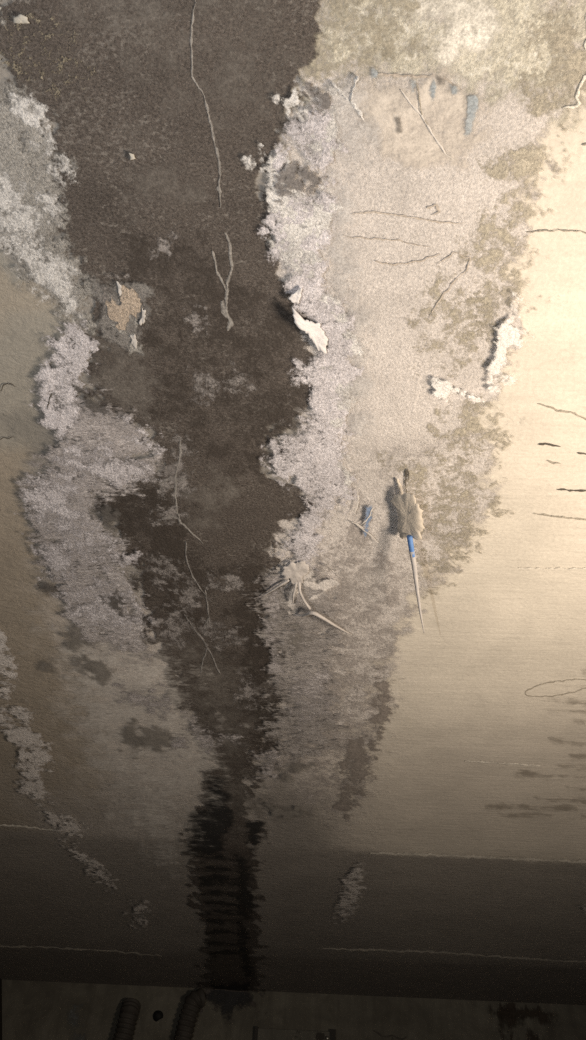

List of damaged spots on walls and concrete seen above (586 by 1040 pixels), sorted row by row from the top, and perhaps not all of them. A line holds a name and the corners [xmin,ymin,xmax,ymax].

crack [190,0,222,208]
spalling [89,274,154,356]
crack [212,233,233,331]
damp [431,292,526,403]
peeling [261,0,586,828]
crack [539,404,586,420]
damp [0,0,379,1019]
crack [534,443,586,520]